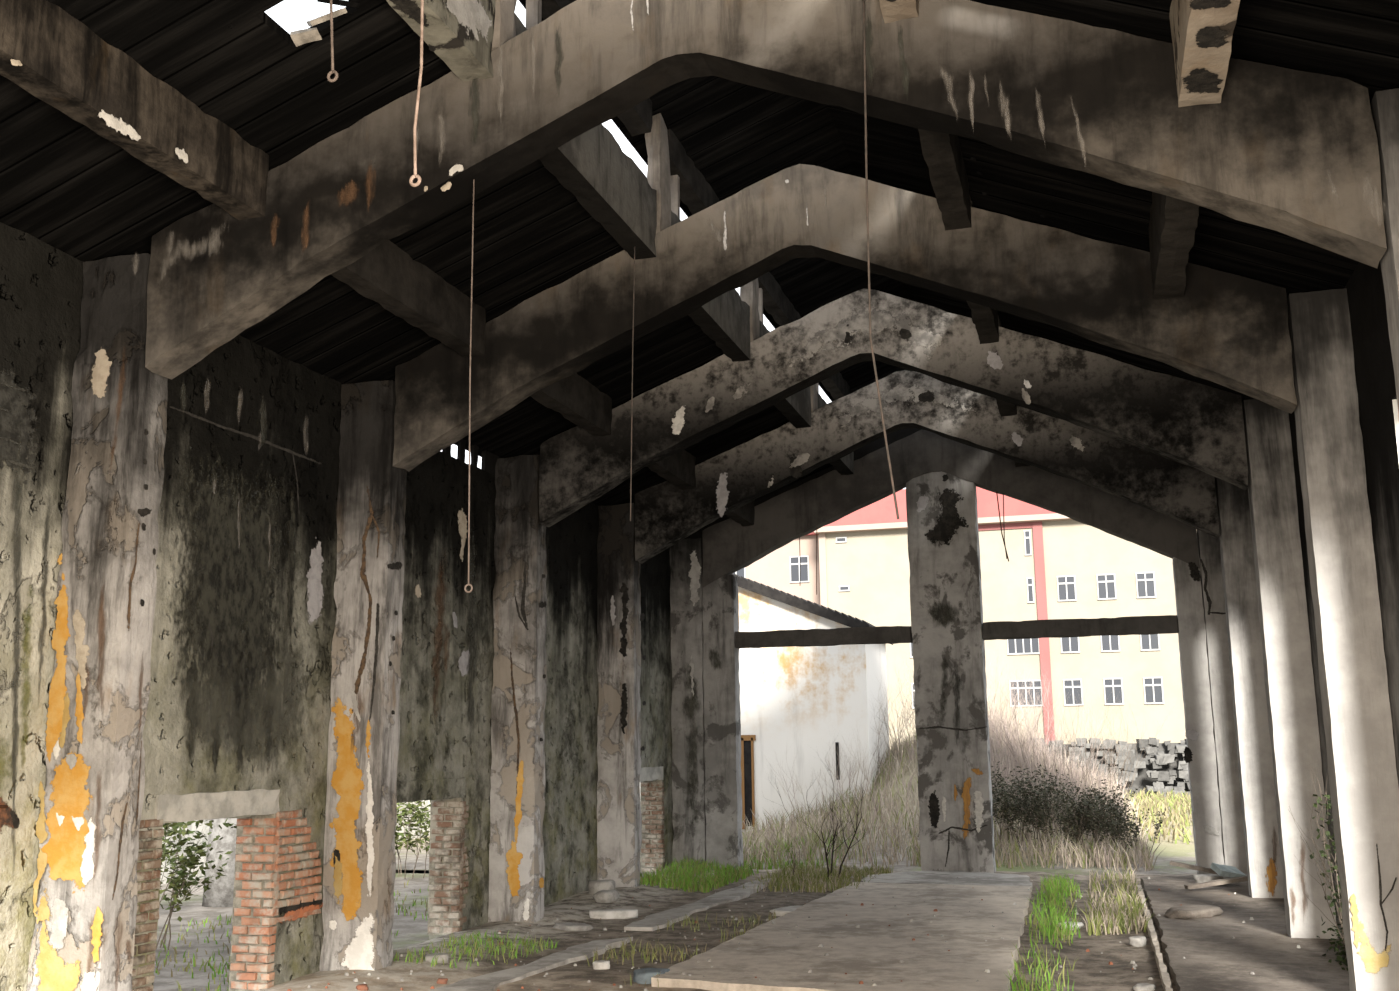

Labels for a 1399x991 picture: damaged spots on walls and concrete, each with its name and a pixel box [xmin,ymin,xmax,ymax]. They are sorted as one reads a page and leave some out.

flaking render [1190,0,1231,10]
flaking render [1196,26,1229,48]
flaking render [1183,68,1223,94]
spalling [98,110,141,141]
spalling [175,148,188,163]
damp [169,447,303,772]
peeling [0,554,104,991]
peeling [272,689,371,930]
peeling [506,760,544,920]
peeling [1350,894,1391,973]